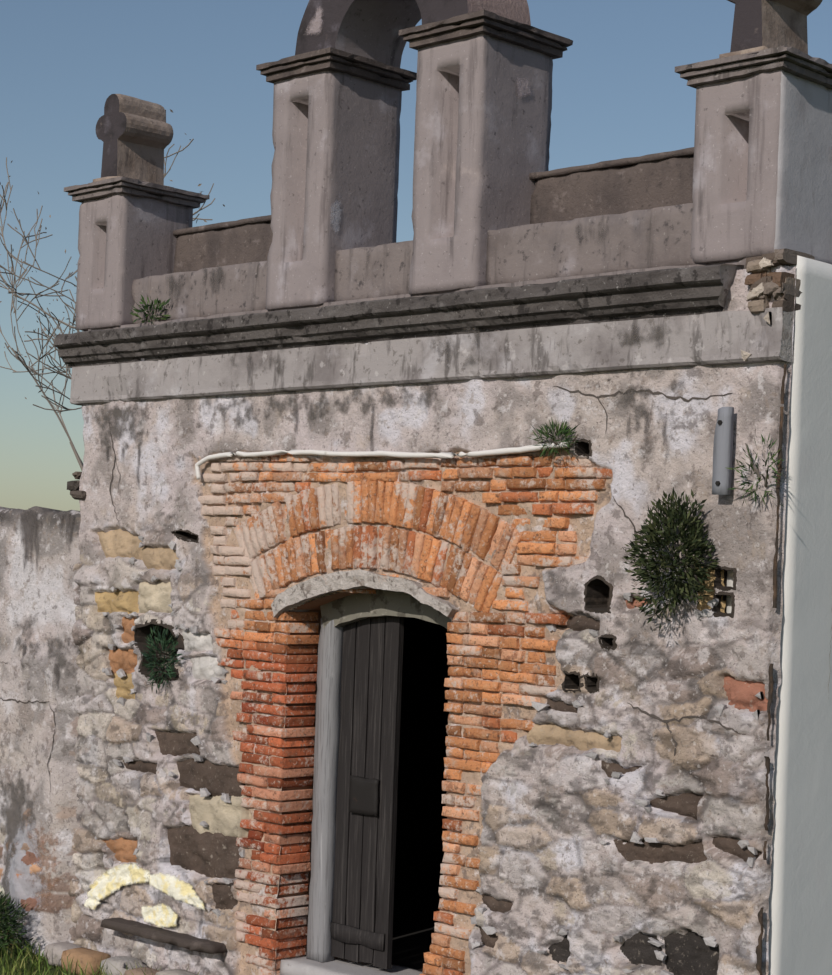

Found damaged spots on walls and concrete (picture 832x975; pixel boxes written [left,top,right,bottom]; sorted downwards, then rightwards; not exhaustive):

spalling [745,248,815,325]
leakage [92,404,146,484]
leakage [270,387,395,440]
crack [553,386,732,434]
spalling [772,364,787,608]
leakage [20,508,38,566]
crack [1,698,55,795]
flaking render [84,453,642,975]
spalling [713,663,774,741]
spalling [599,756,770,867]
spalling [613,930,719,975]
spalling [755,907,764,975]